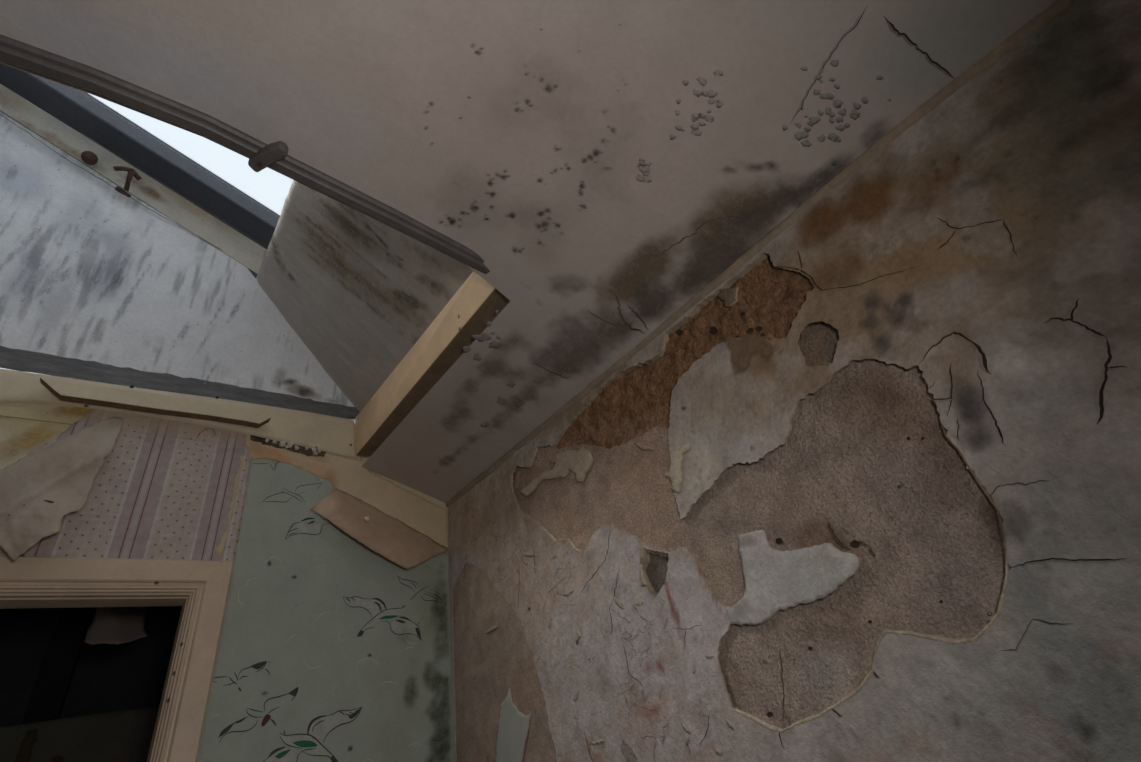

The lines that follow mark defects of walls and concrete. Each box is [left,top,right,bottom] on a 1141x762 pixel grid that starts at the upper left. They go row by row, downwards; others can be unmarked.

crack [790,5,955,123]
damp [296,201,421,314]
damp [608,160,890,318]
crack [777,217,1017,292]
crack [919,332,1005,446]
crack [1043,298,1128,425]
spalling [513,256,1012,733]
damp [426,670,450,762]
peeling [453,563,557,762]